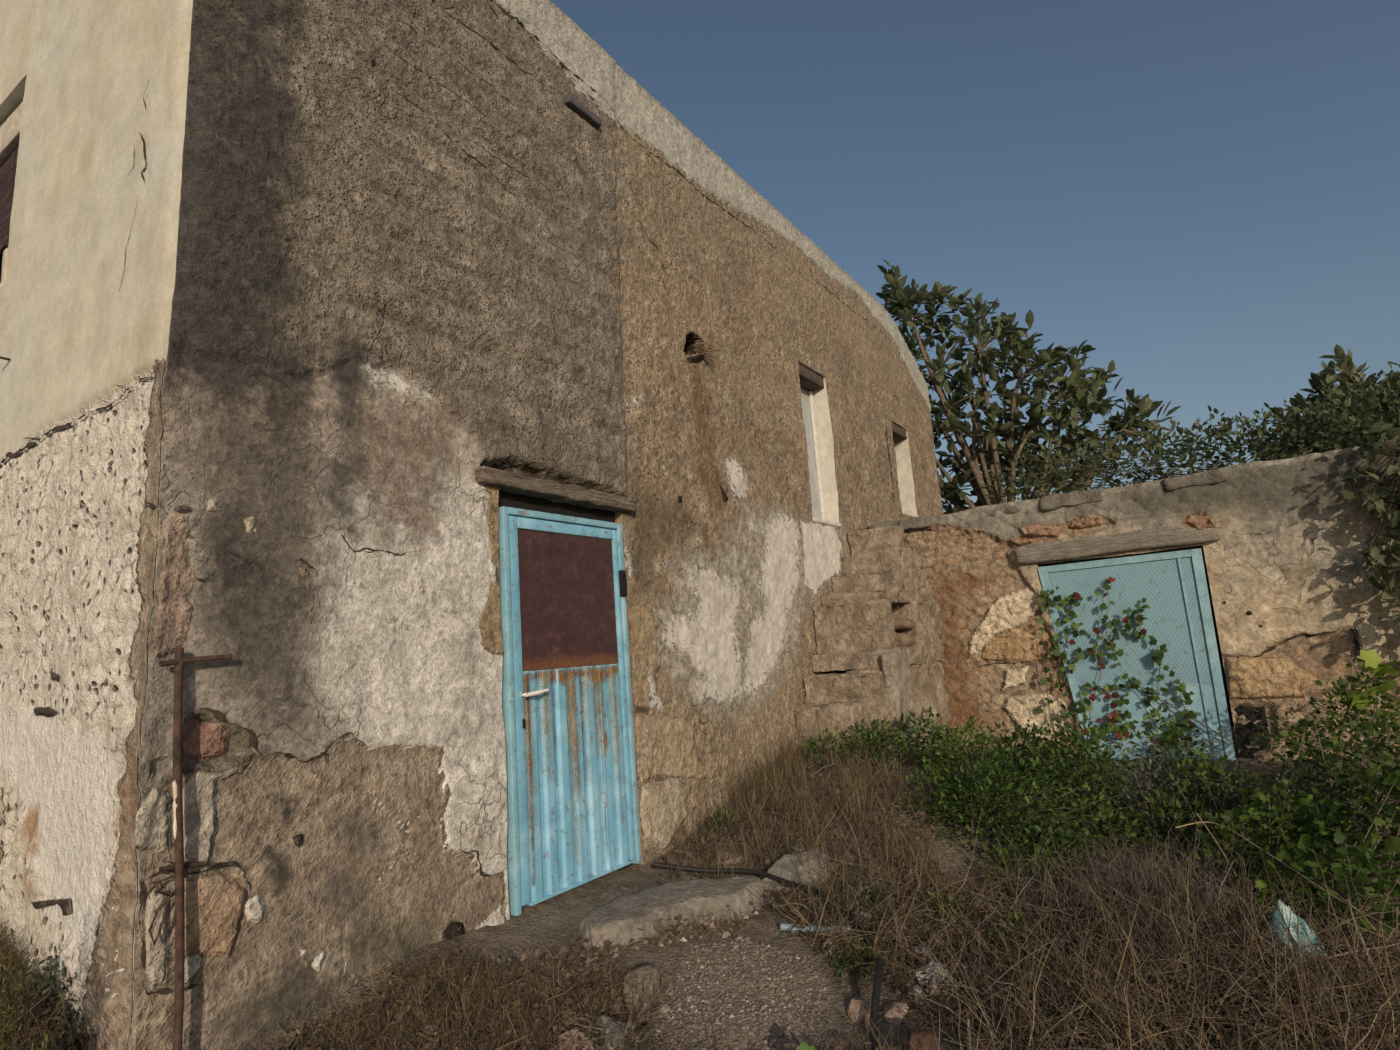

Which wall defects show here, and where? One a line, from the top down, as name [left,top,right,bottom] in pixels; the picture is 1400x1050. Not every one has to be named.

water stain [164,0,308,678]
water stain [333,346,447,537]
crack [328,525,420,556]
peeling [624,536,633,583]
spalling [34,706,57,717]
peeling [76,359,506,1050]
corrosion [524,666,618,794]
peeling [626,459,843,851]
peeling [968,584,1067,742]
spalling [31,898,72,916]